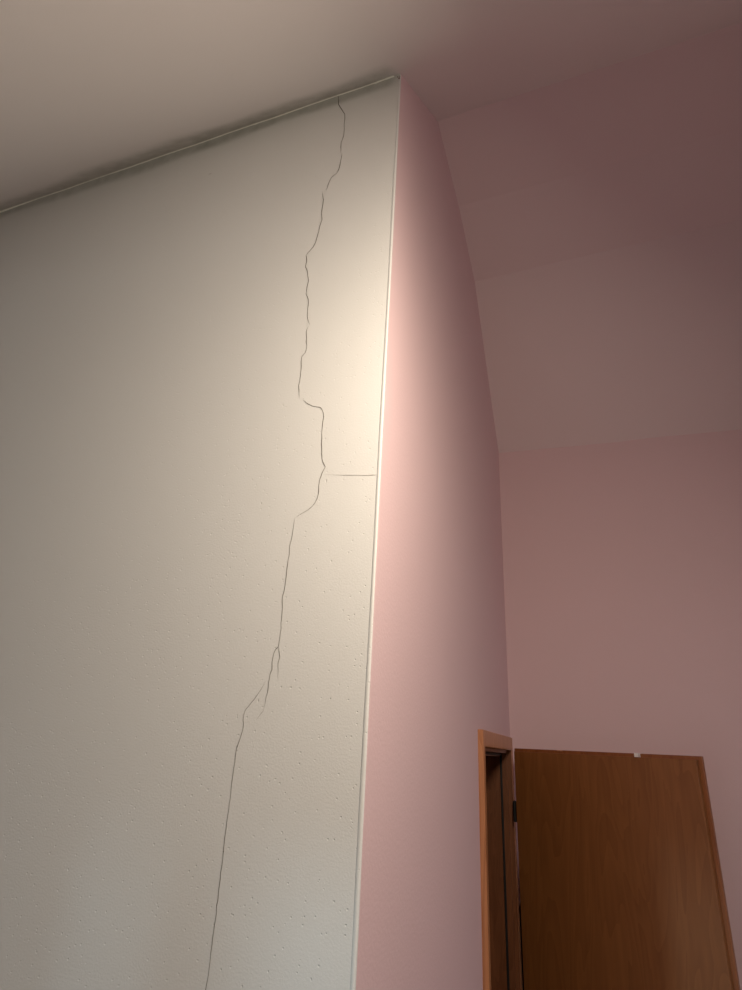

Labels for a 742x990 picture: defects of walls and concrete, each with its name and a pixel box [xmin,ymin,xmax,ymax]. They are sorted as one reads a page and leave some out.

crack [205,96,345,990]